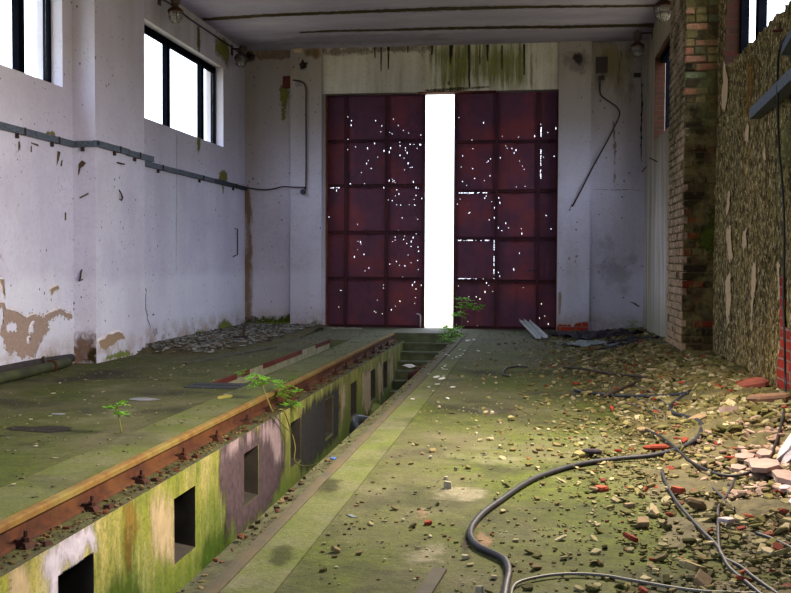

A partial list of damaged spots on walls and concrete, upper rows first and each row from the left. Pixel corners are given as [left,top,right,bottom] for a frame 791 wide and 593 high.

leakage [323,46,433,71]
leakage [468,44,489,87]
peeling [0,277,73,360]
peeling [97,329,125,350]
leakage [362,353,393,416]
spalling [0,333,475,593]
leakage [10,566,29,593]
leakage [43,525,97,593]
leakage [151,499,174,560]